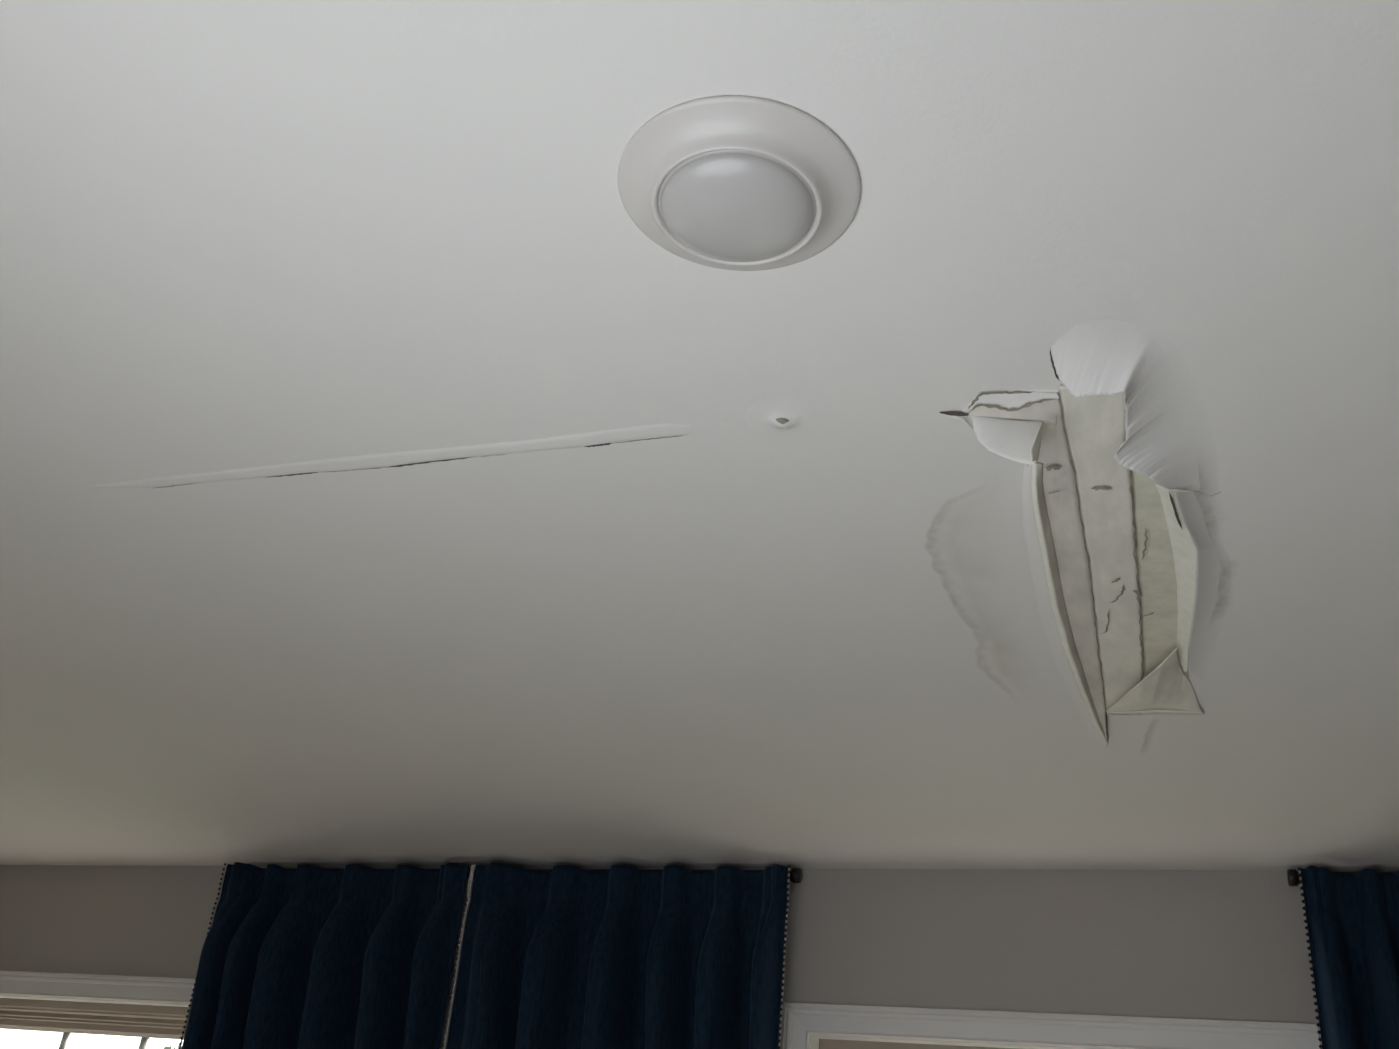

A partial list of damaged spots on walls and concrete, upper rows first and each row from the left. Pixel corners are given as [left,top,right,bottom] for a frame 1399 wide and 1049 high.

peeling [940,319,1231,747]